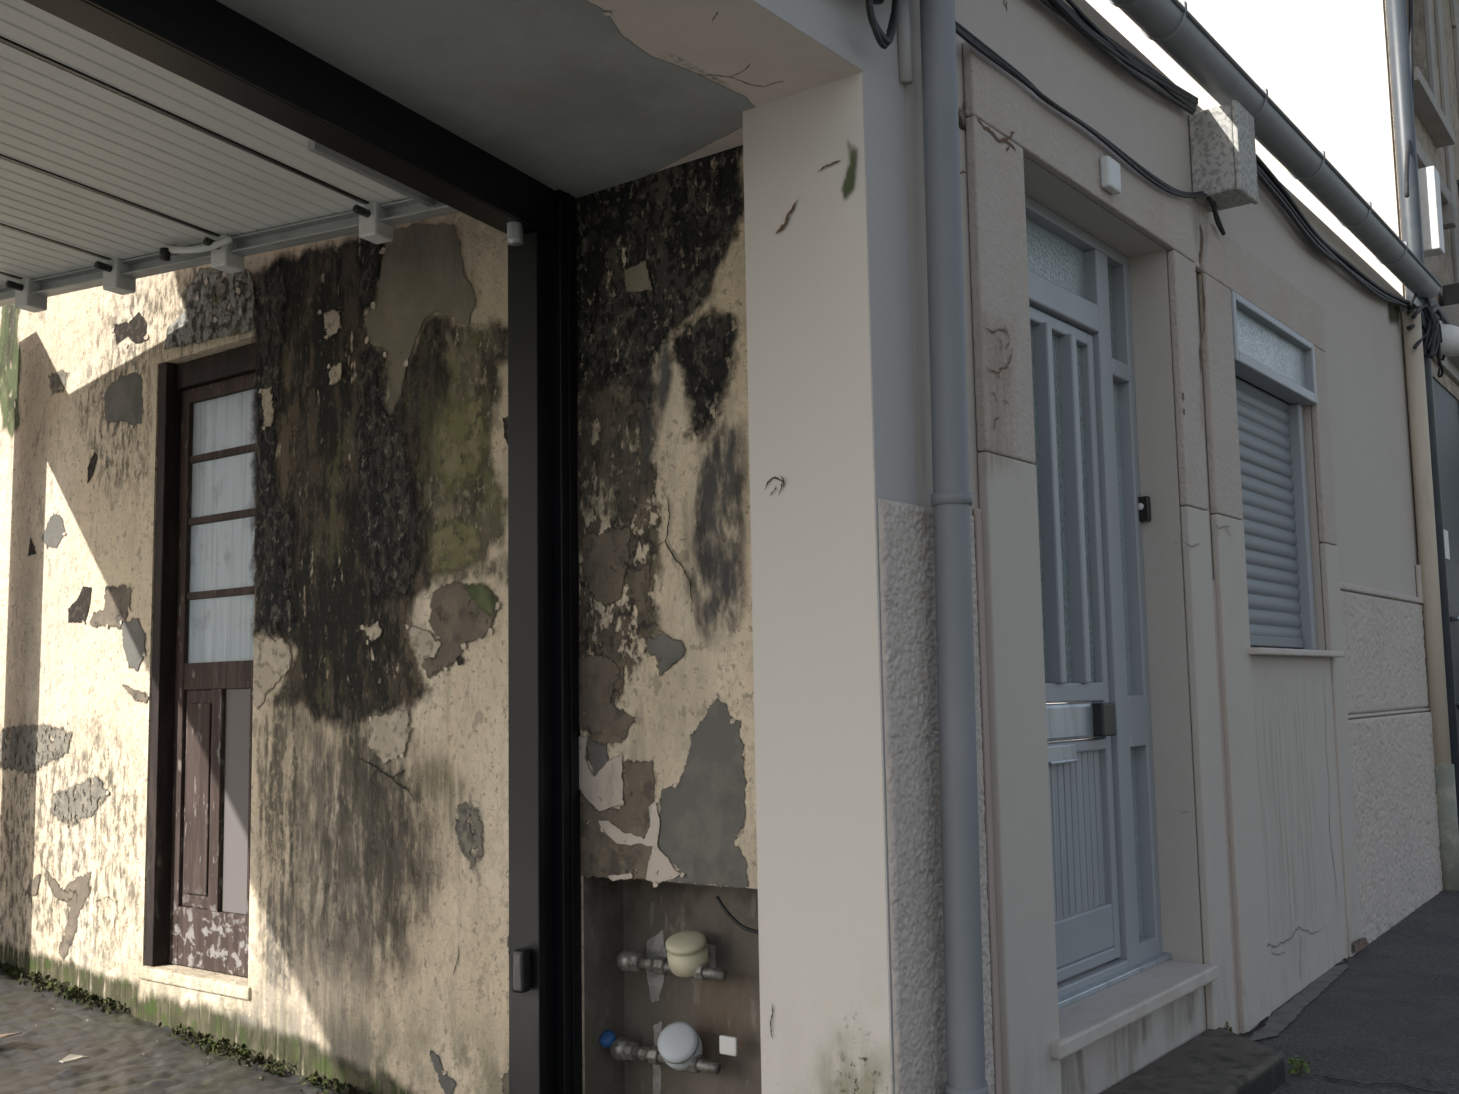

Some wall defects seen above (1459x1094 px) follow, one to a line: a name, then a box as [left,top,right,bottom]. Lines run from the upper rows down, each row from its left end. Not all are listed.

peeling [216,0,755,198]
crack [978,119,1016,151]
water stain [576,145,744,635]
flaking render [66,584,148,703]
water stain [251,238,450,987]
spalling [422,581,500,679]
flaking render [577,380,749,889]
flaking render [0,724,72,773]
flaking render [49,776,109,827]
water stain [455,802,484,870]
crack [1267,752,1337,974]
water stain [239,1026,369,1092]